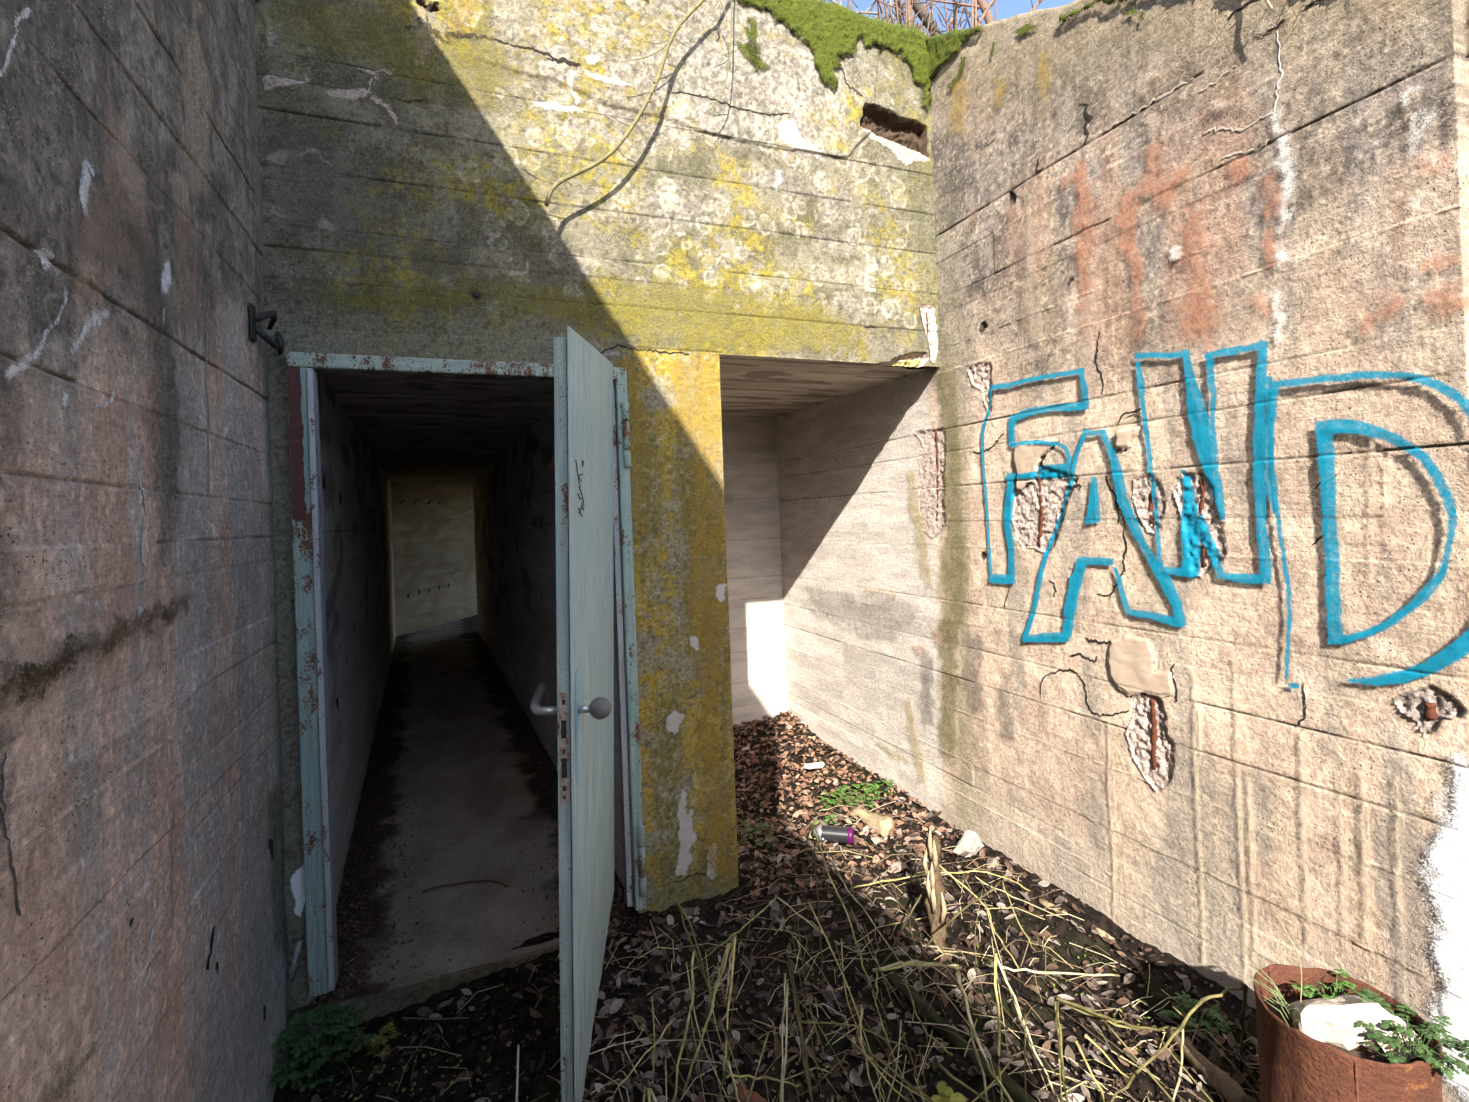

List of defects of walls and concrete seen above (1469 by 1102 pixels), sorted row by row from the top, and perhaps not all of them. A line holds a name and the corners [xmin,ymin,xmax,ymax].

crack [405,16,581,66]
spalling [860,104,930,159]
crack [1077,66,1234,144]
crack [1203,0,1321,160]
leakage [1268,109,1298,343]
leakage [907,473,933,583]
spalling [1011,468,1077,552]
spalling [1132,473,1226,577]
leakage [879,617,982,783]
crack [1040,638,1178,717]
spalling [1125,693,1175,792]
spalling [1394,687,1464,737]